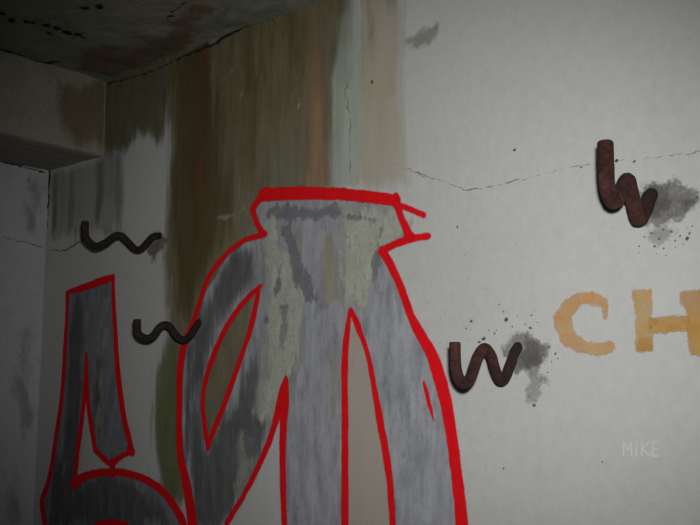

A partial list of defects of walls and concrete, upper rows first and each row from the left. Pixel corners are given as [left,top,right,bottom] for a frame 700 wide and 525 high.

leakage [176,46,228,311]
leakage [332,0,396,184]
leakage [407,25,438,47]